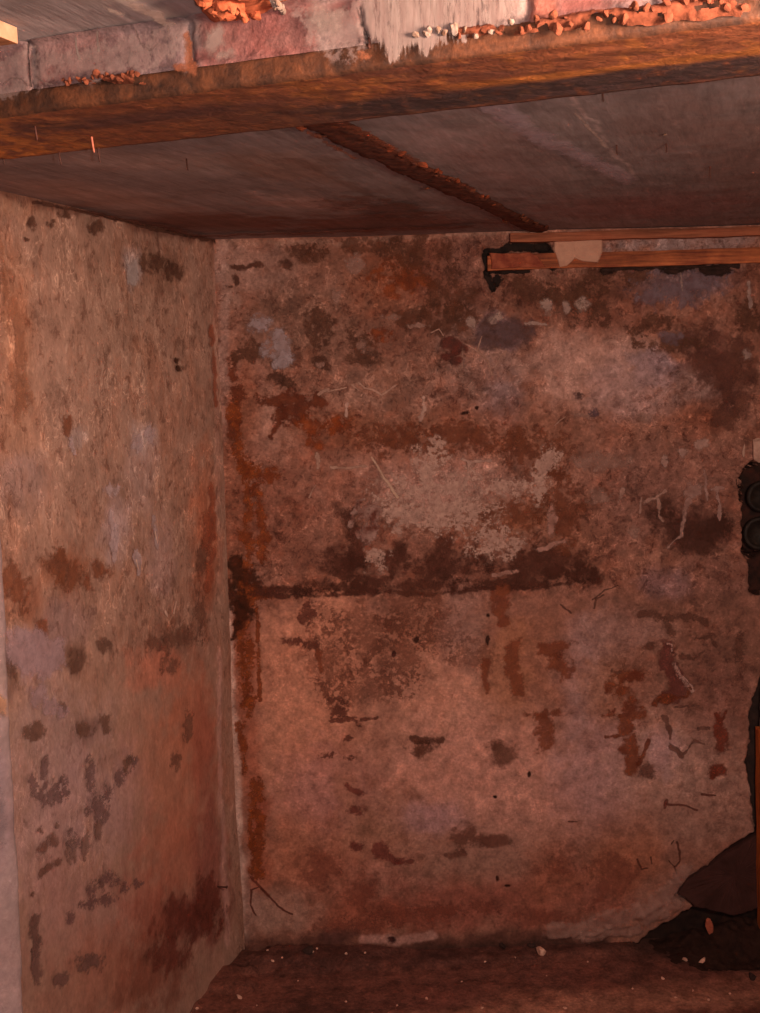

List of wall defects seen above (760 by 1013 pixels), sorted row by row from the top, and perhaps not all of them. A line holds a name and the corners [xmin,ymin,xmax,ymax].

corrosion [174,32,198,75]
water stain [361,0,519,63]
corrosion [342,125,496,206]
corrosion [200,482,217,593]
water stain [251,435,633,626]
corrosion [209,325,586,880]
water stain [282,637,320,651]
water stain [76,714,111,737]
water stain [325,695,379,727]